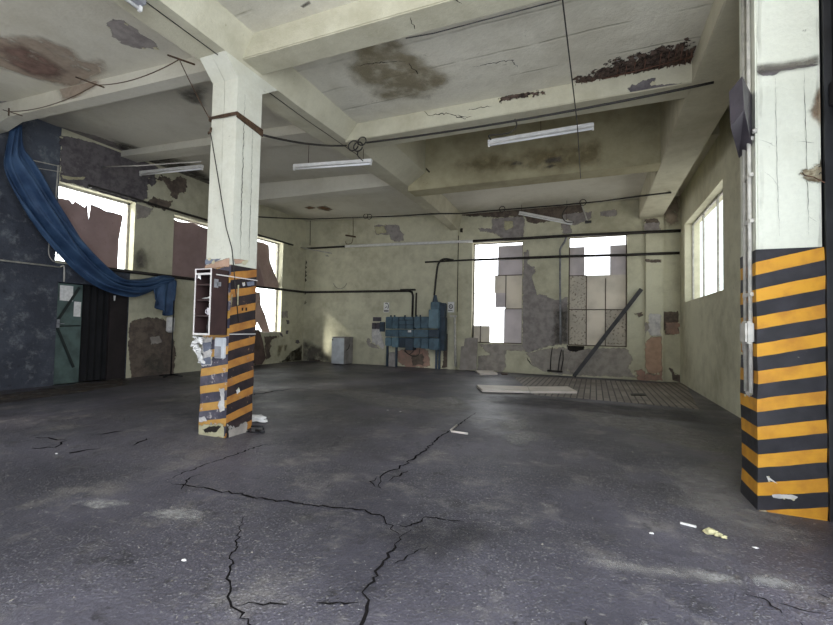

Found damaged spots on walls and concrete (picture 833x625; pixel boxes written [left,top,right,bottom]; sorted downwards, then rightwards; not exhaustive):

peeling [107,19,159,50]
water stain [0,38,100,99]
spalling [573,37,696,92]
spalling [498,90,545,103]
spalling [800,160,825,183]
peeling [374,224,404,242]
peeling [477,250,680,382]
peeling [128,317,176,378]
peeling [201,336,213,367]
crack [369,413,475,488]
crack [167,443,459,625]
crack [746,592,830,625]